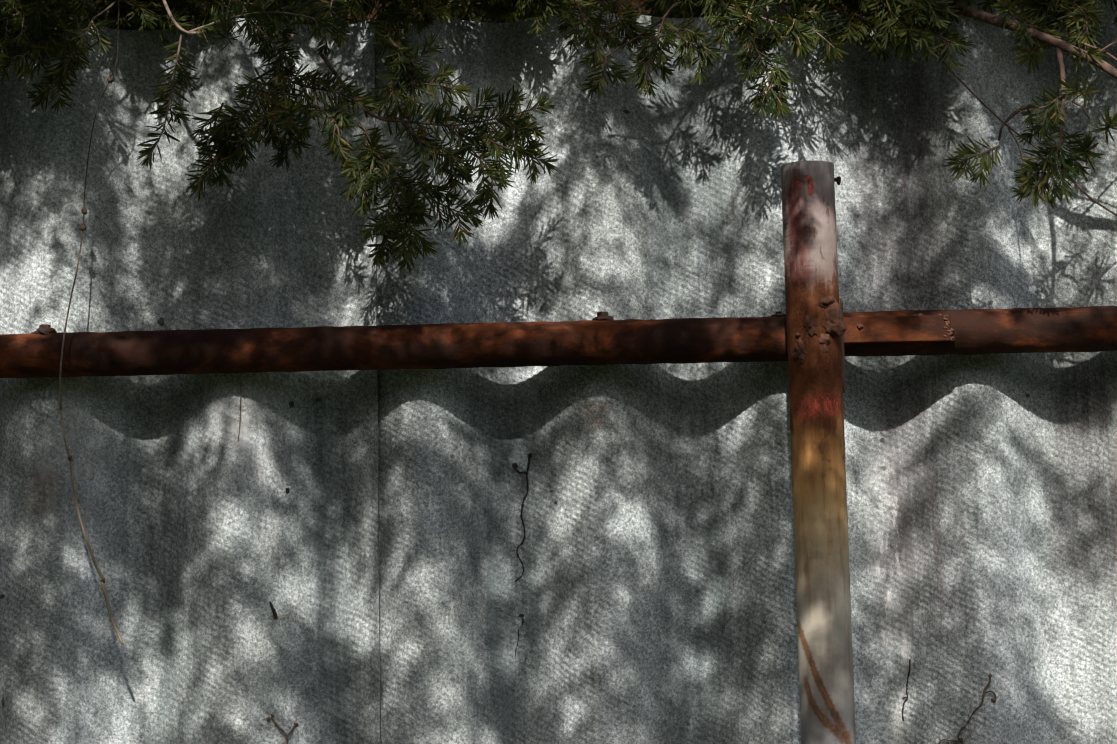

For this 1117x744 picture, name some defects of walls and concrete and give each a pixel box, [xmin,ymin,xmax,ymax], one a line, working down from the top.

crack [512,453,532,582]
crack [515,614,524,656]